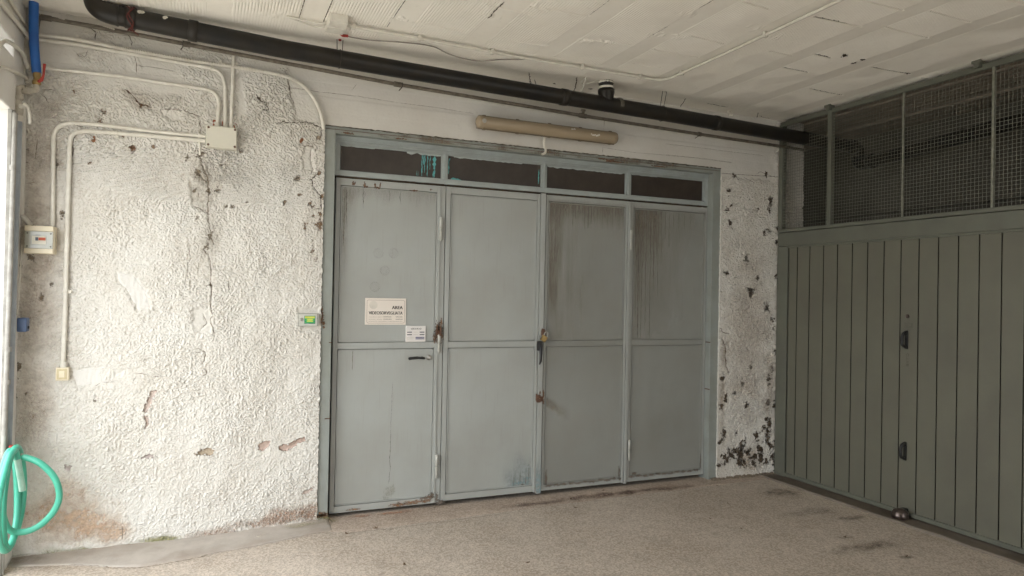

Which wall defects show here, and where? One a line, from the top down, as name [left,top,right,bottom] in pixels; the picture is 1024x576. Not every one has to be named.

crack [133,156,230,386]
spalling [143,390,157,427]
spalling [194,448,214,457]
spalling [258,437,306,452]